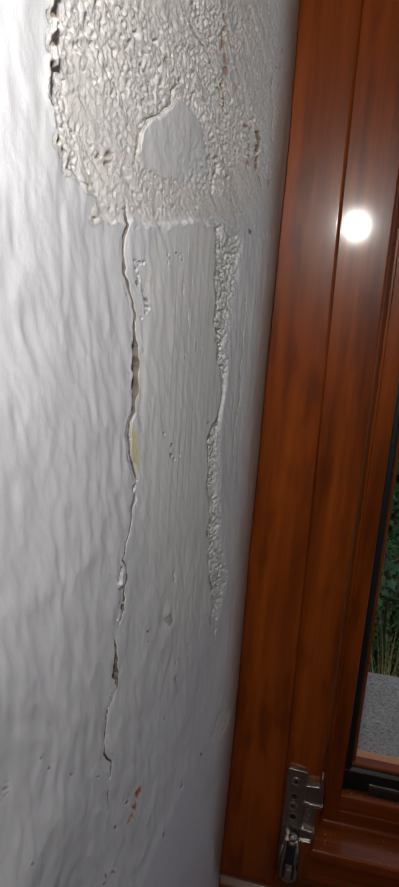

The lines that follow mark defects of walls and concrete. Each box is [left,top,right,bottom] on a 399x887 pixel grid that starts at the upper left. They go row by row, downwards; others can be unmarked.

crack [101,203,142,814]
spalling [45,0,300,649]